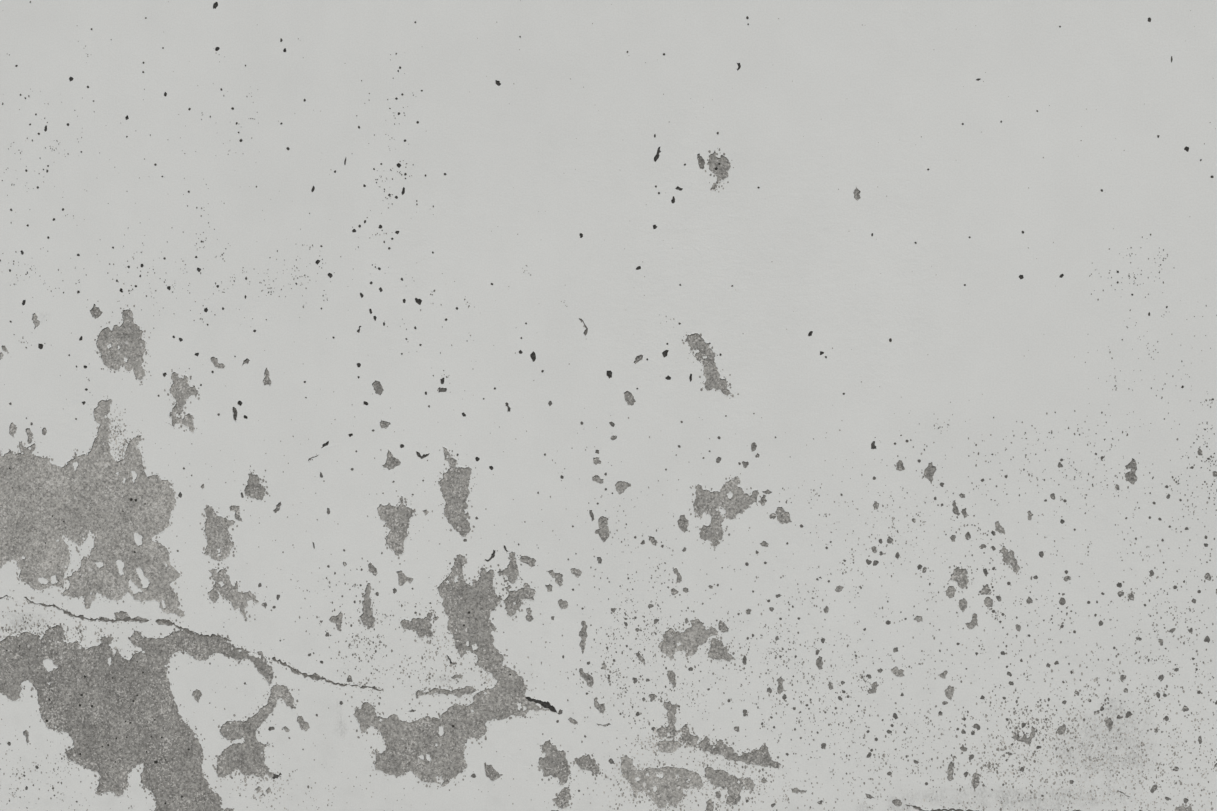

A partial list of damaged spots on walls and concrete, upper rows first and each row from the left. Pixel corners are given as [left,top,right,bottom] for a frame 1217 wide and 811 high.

peeling [697,149,732,191]
peeling [89,303,148,382]
peeling [685,332,731,398]
peeling [168,371,200,434]
peeling [376,446,473,586]
peeling [677,476,792,548]
crack [0,595,232,643]
peeling [0,398,322,811]
crack [271,656,382,691]
peeling [352,545,583,787]
peeling [619,618,783,811]
crack [905,803,979,811]